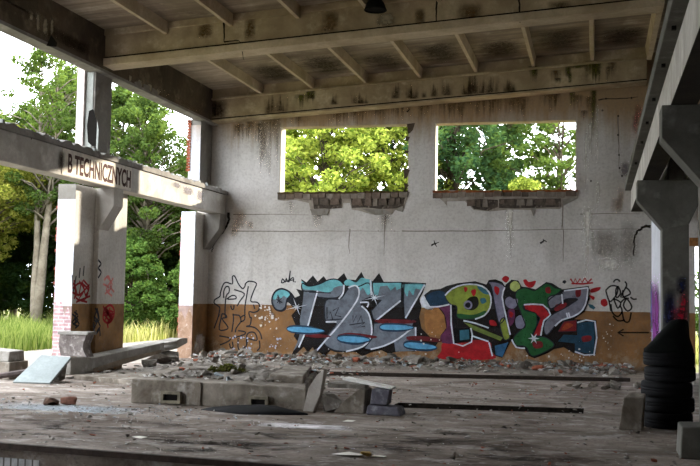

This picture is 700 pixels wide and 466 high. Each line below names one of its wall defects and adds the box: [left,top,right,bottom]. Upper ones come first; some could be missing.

spalling [277,191,410,215]
spalling [433,189,580,216]
crack [633,225,651,256]